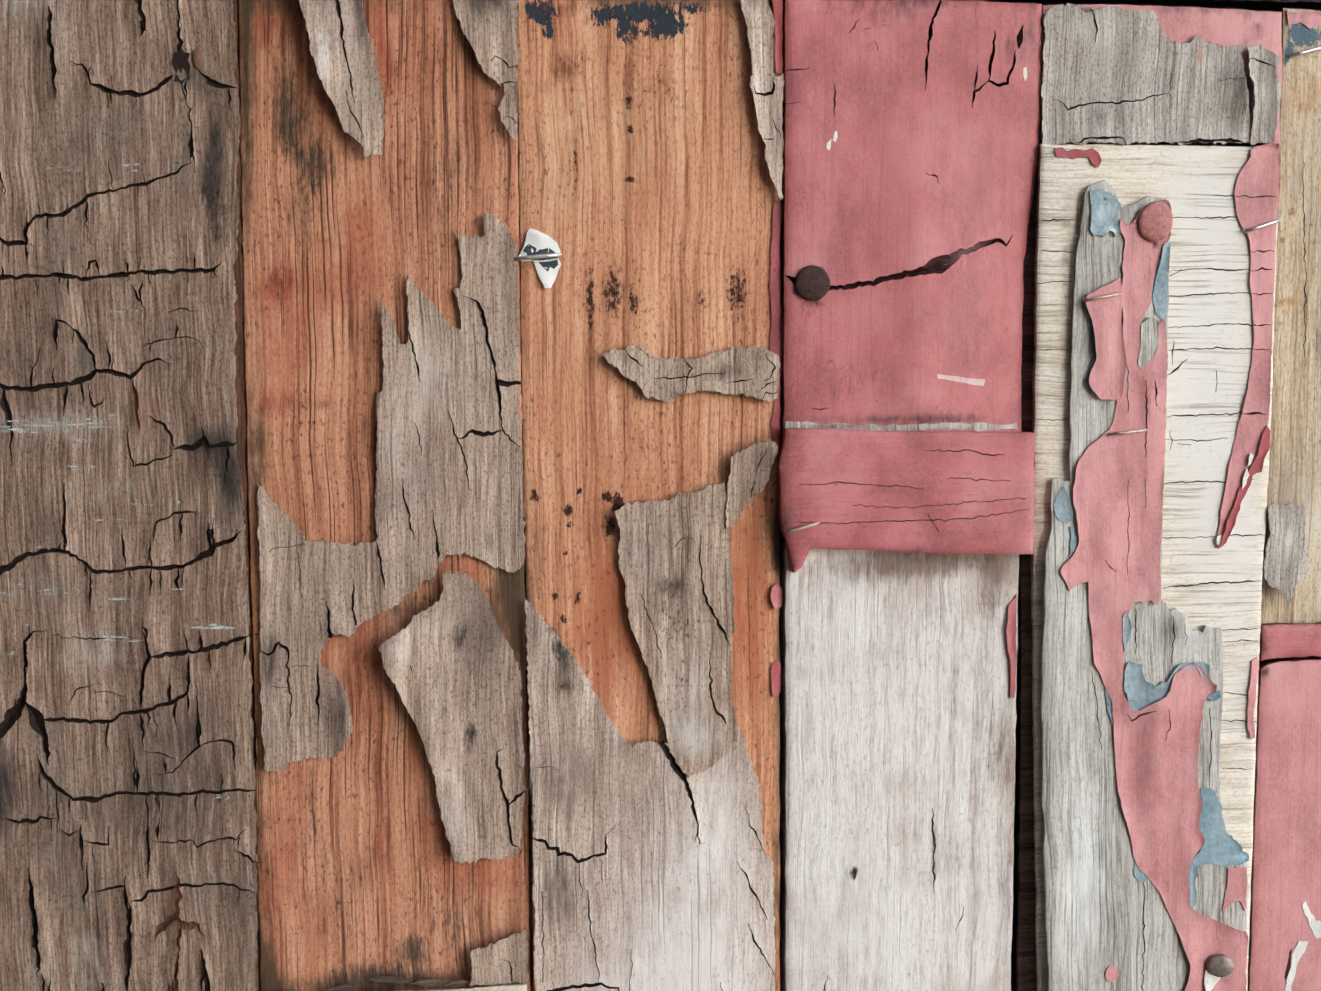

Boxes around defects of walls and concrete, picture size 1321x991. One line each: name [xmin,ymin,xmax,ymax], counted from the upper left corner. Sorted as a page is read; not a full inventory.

peeling [525,0,559,39]
peeling [583,0,712,45]
crack [925,0,942,91]
crack [972,32,1016,108]
peeling [1283,9,1321,65]
peeling [1054,147,1102,167]
crack [0,0,237,472]
crack [829,236,1012,291]
peeling [1216,143,1281,549]
crack [448,296,521,490]
peeling [1054,188,1249,991]
crack [0,486,385,991]